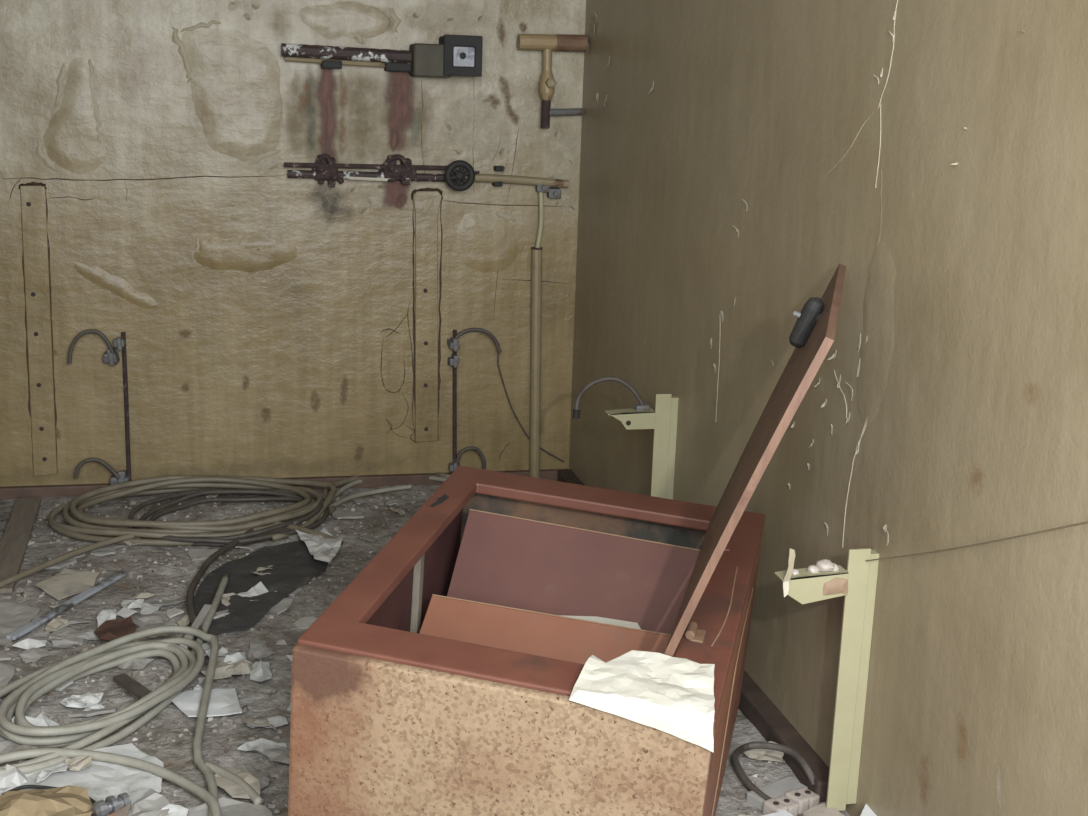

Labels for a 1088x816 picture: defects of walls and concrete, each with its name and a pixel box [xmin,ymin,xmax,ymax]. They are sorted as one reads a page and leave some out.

corrosion [301,68,344,161]
corrosion [387,71,413,149]
crack [823,0,898,188]
corrosion [385,180,408,208]